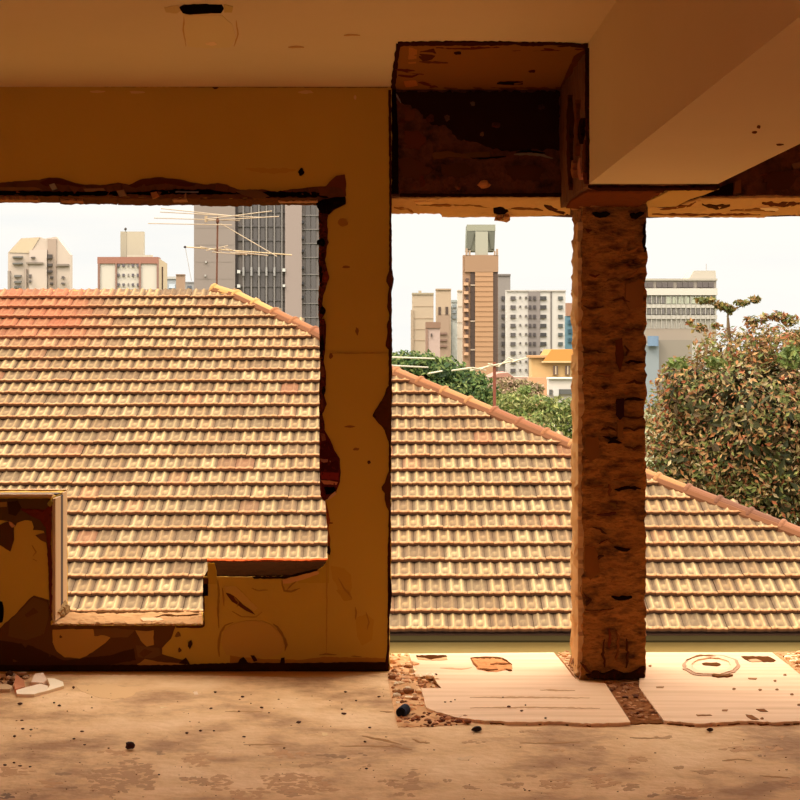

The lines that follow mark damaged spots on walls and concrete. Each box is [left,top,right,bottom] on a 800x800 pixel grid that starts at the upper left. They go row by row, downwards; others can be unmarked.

flaking render [0,174,346,501]
flaking render [373,41,800,671]
peeling [0,498,331,665]